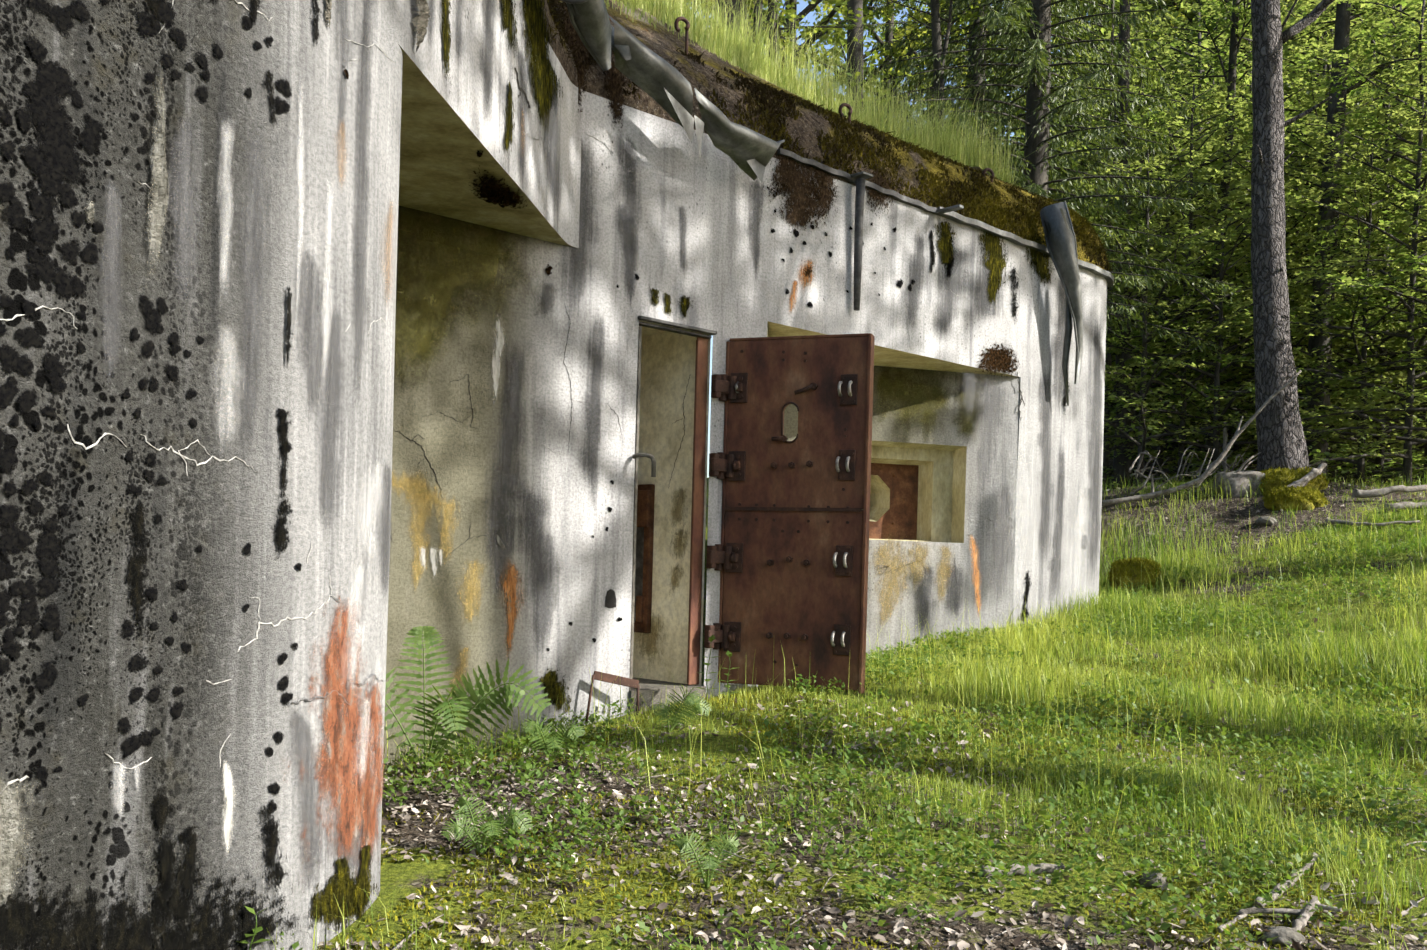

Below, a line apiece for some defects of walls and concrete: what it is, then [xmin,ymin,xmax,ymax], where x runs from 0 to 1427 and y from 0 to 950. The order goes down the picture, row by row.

leakage [169,121,194,290]
leakage [104,184,120,373]
leakage [244,138,267,431]
rust [789,261,813,312]
crack [67,424,259,476]
crack [393,374,475,500]
crack [206,541,339,685]
rust [501,564,523,653]
rust [970,536,982,614]
crack [288,674,383,706]
rust [300,596,385,868]
efflorescence [0,777,32,906]